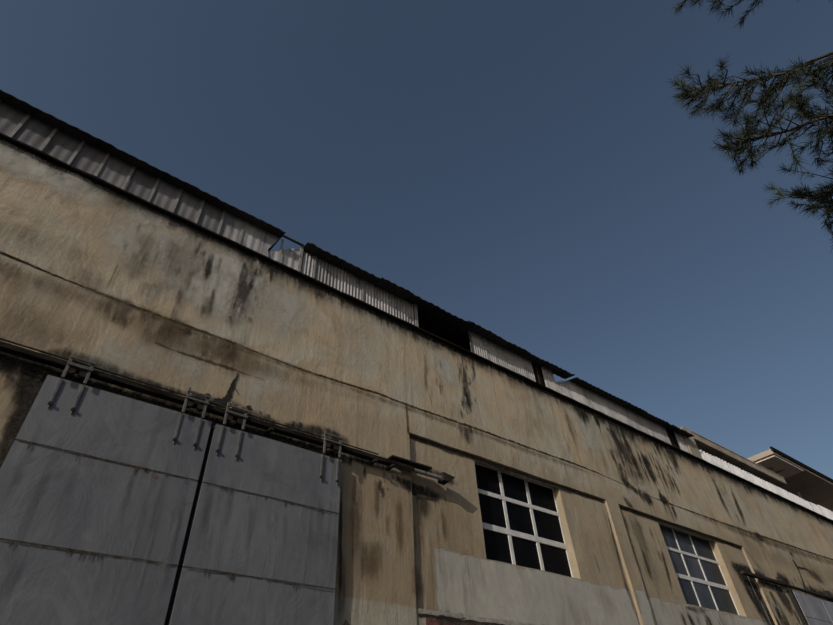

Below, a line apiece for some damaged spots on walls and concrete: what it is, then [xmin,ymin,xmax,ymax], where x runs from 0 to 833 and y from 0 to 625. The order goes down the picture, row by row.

leakage [0,139,833,575]
leakage [732,563,803,625]
leakage [806,572,833,602]